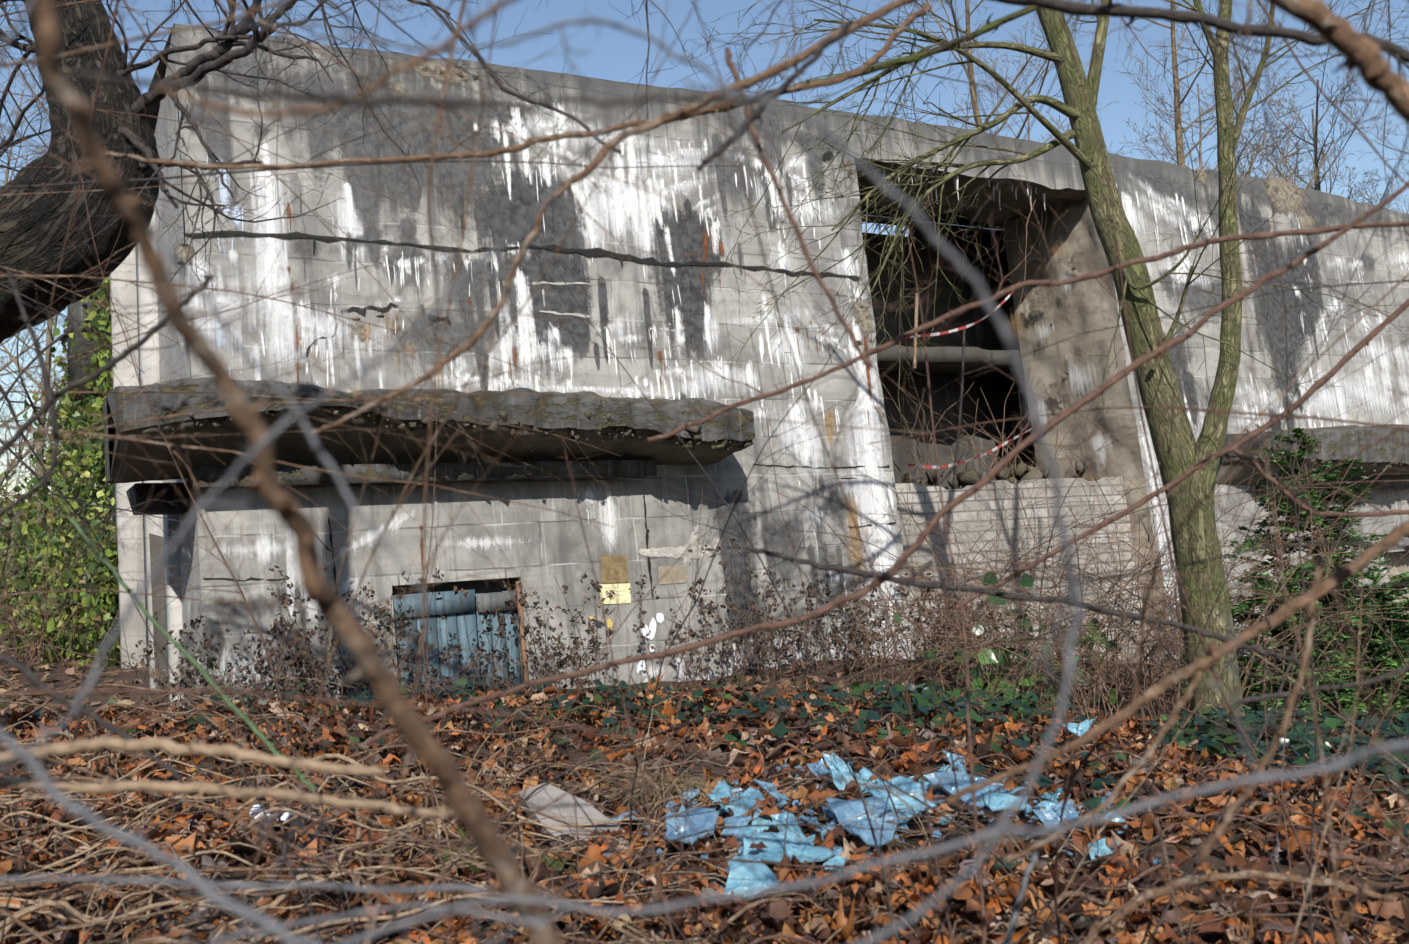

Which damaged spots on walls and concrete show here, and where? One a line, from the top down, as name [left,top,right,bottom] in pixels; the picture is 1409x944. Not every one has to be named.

damp [156,393,184,409]
damp [184,55,911,683]
corrosion [701,231,724,291]
damp [1116,170,1222,431]
damp [1233,177,1409,431]